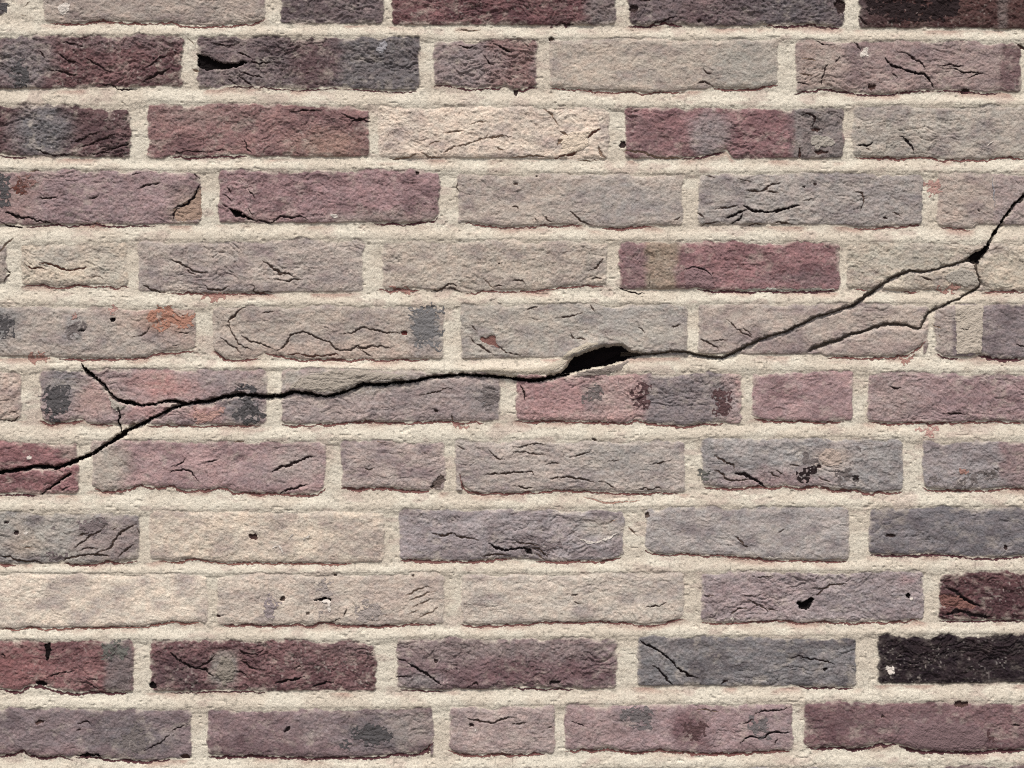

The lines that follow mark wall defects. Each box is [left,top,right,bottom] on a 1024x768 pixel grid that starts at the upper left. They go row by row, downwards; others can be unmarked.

crack [621,190,1024,363]
crack [0,140,918,696]
crack [869,413,1020,427]